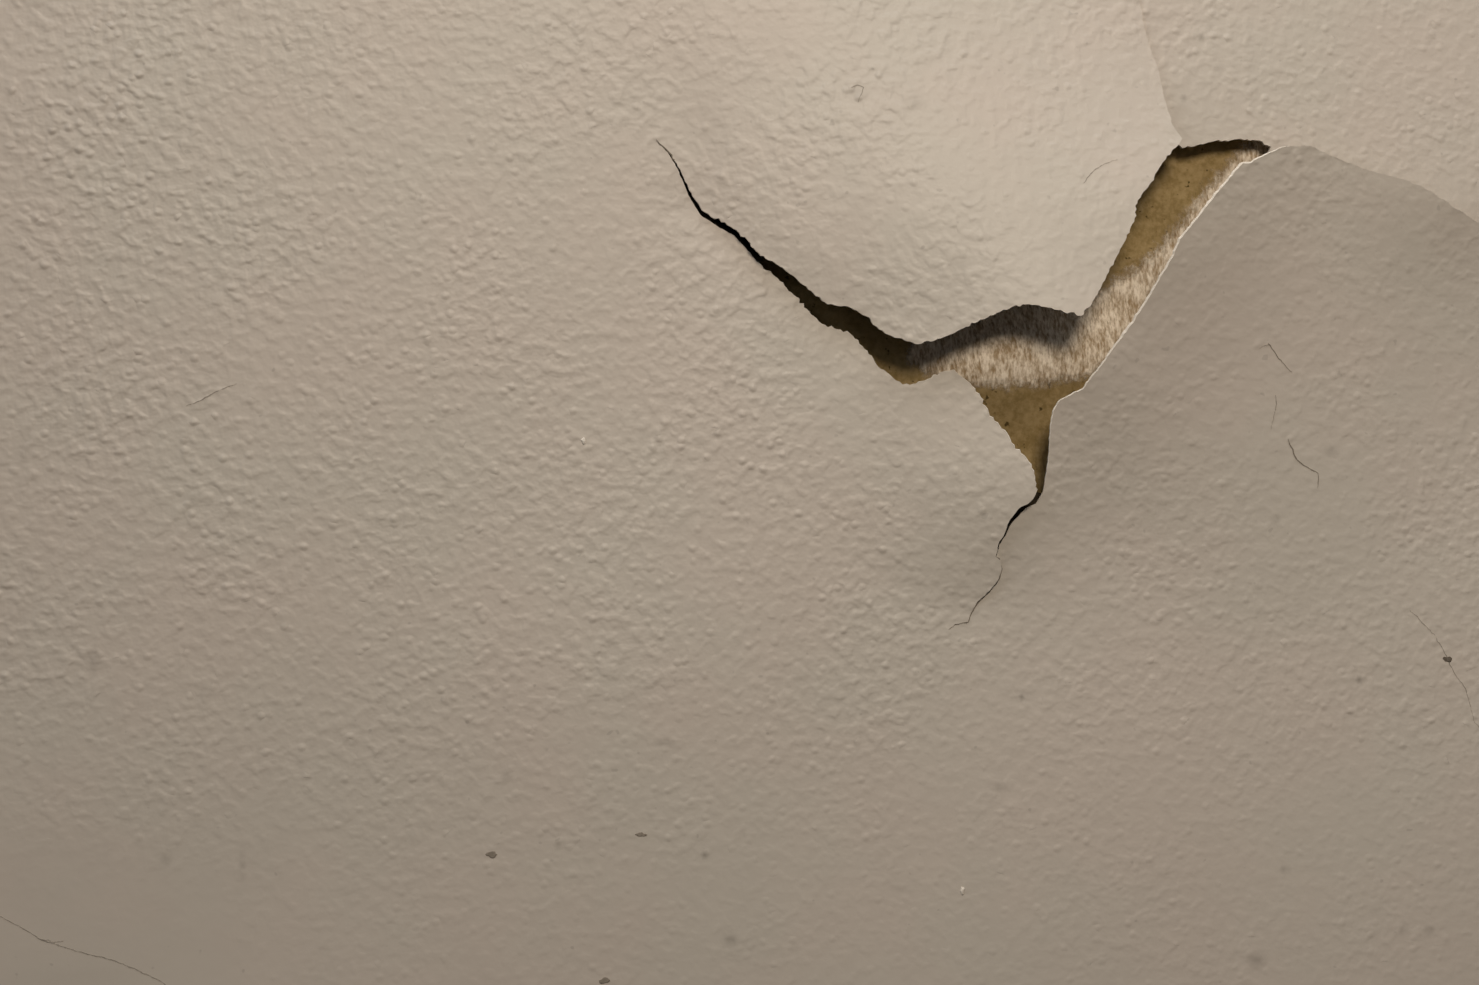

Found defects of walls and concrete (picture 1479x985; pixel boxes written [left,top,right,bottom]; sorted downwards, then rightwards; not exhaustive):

peeling [627,0,1269,630]